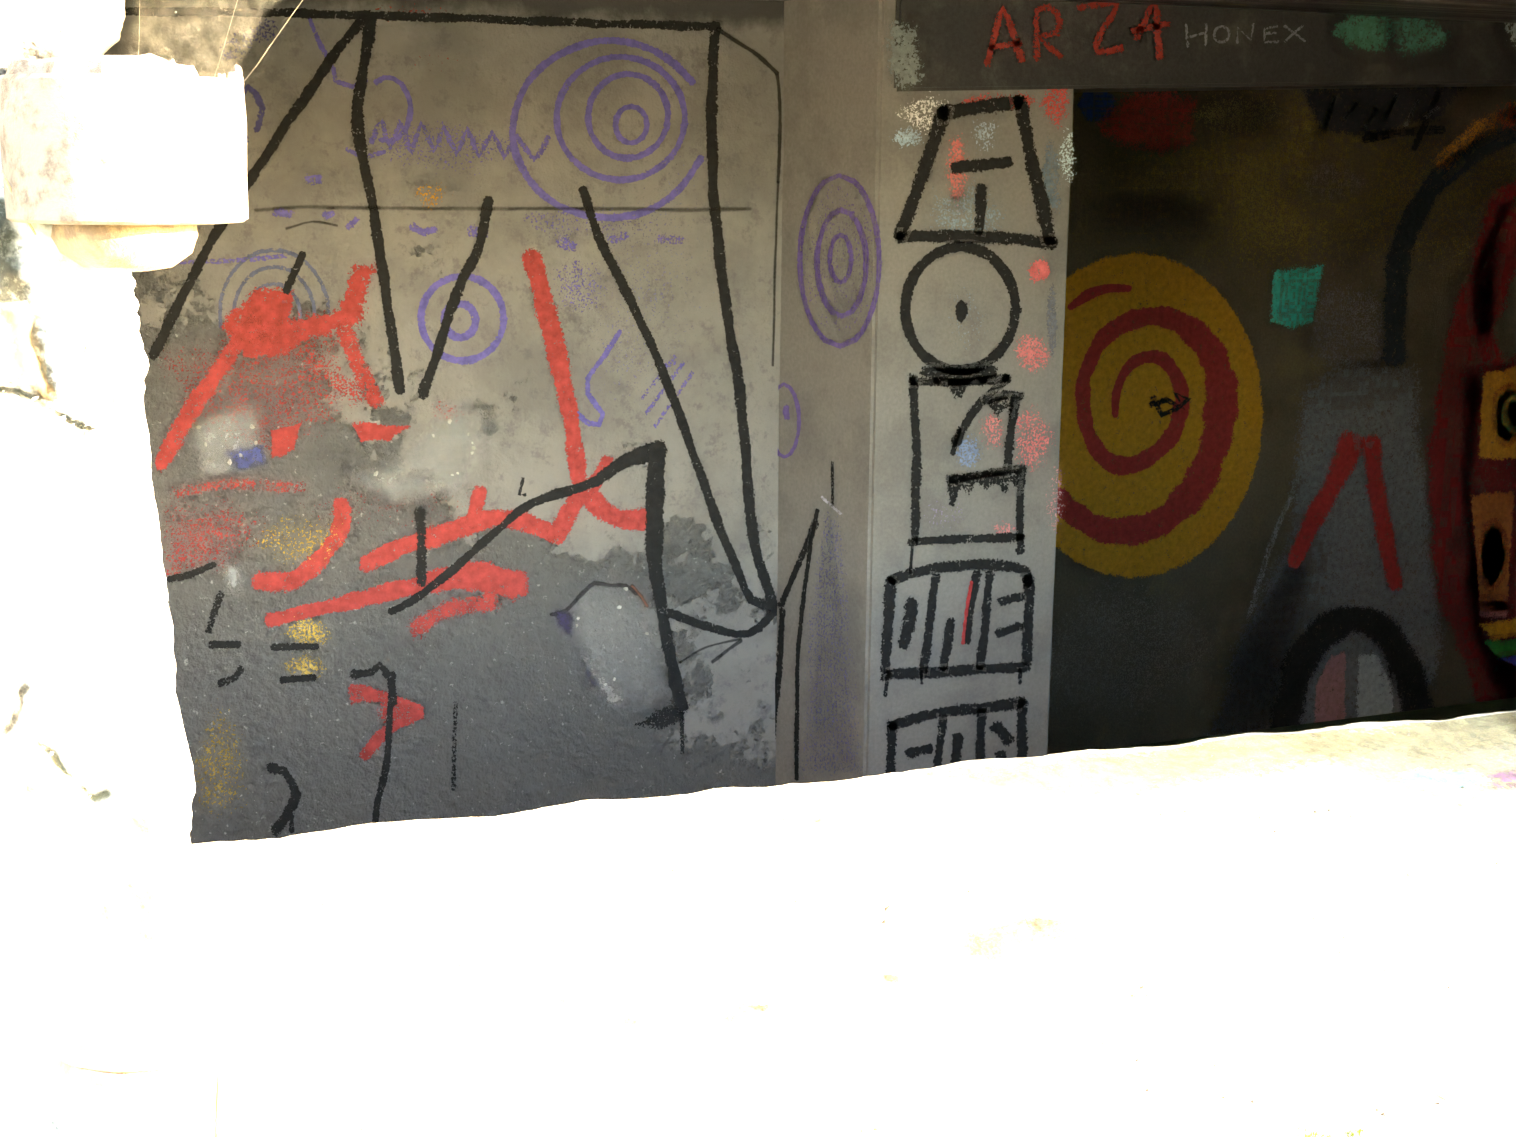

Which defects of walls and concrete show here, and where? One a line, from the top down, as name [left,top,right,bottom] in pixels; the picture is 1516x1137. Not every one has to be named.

corrosion [5,53,199,77]